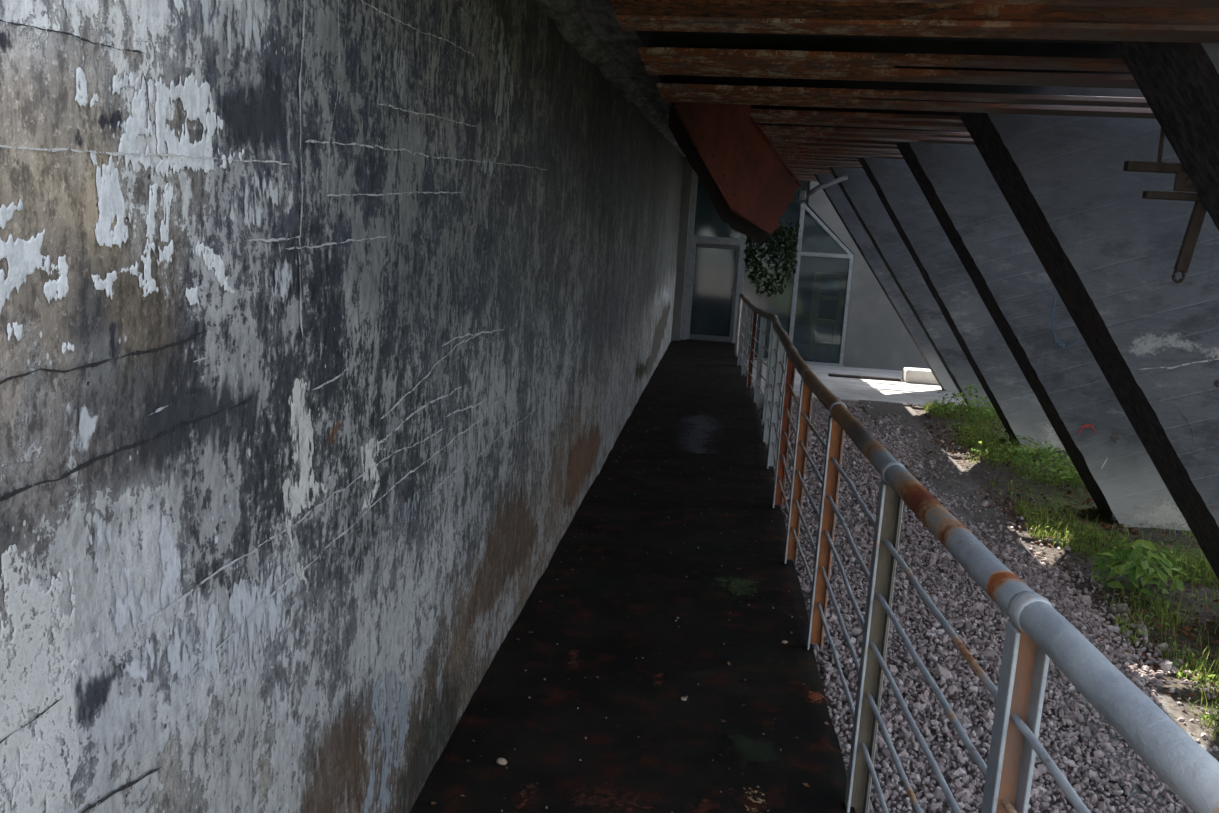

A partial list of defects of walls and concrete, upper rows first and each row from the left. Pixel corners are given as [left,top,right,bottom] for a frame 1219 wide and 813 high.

crack [0,19,143,53]
peeling [200,0,286,62]
water stain [222,70,287,153]
peeling [75,67,244,300]
peeling [230,171,293,230]
peeling [0,199,69,341]
peeling [185,286,199,305]
crack [0,330,208,385]
crack [0,392,258,501]
peeling [0,544,84,813]
crack [0,698,63,744]
rust [400,677,458,813]